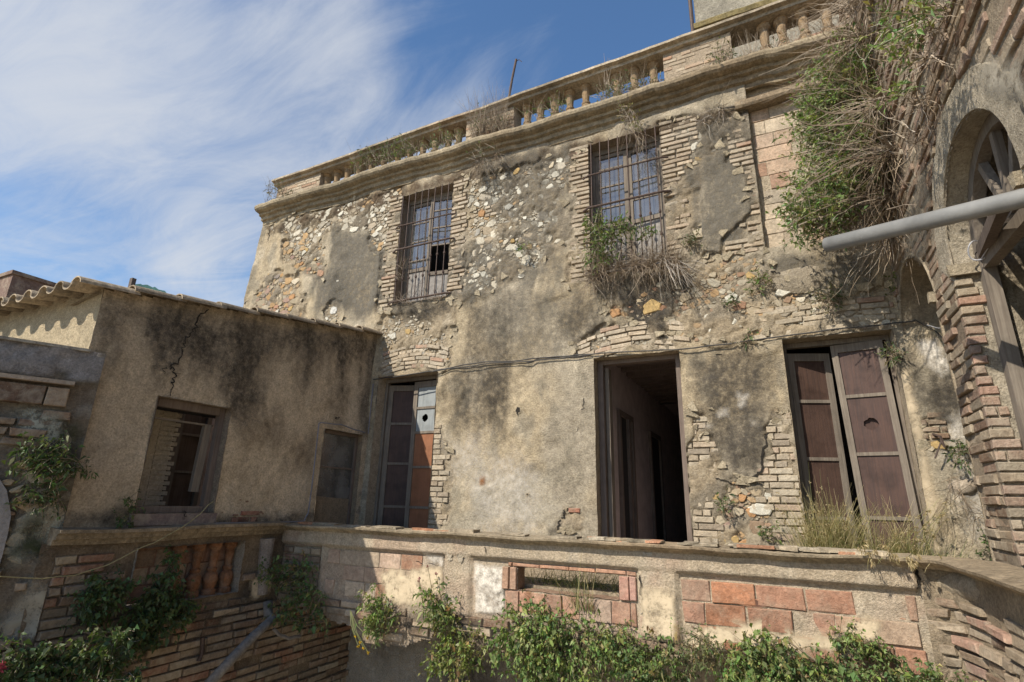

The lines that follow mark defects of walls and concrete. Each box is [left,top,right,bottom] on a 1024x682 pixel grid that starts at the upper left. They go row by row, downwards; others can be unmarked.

crack [162,309,209,396]
leakage [152,307,362,403]
flaking render [250,188,457,376]
flaking render [428,424,455,529]
flaking render [432,138,593,309]
leakage [696,351,765,476]
flaking render [568,111,896,360]
flaking render [684,400,805,546]